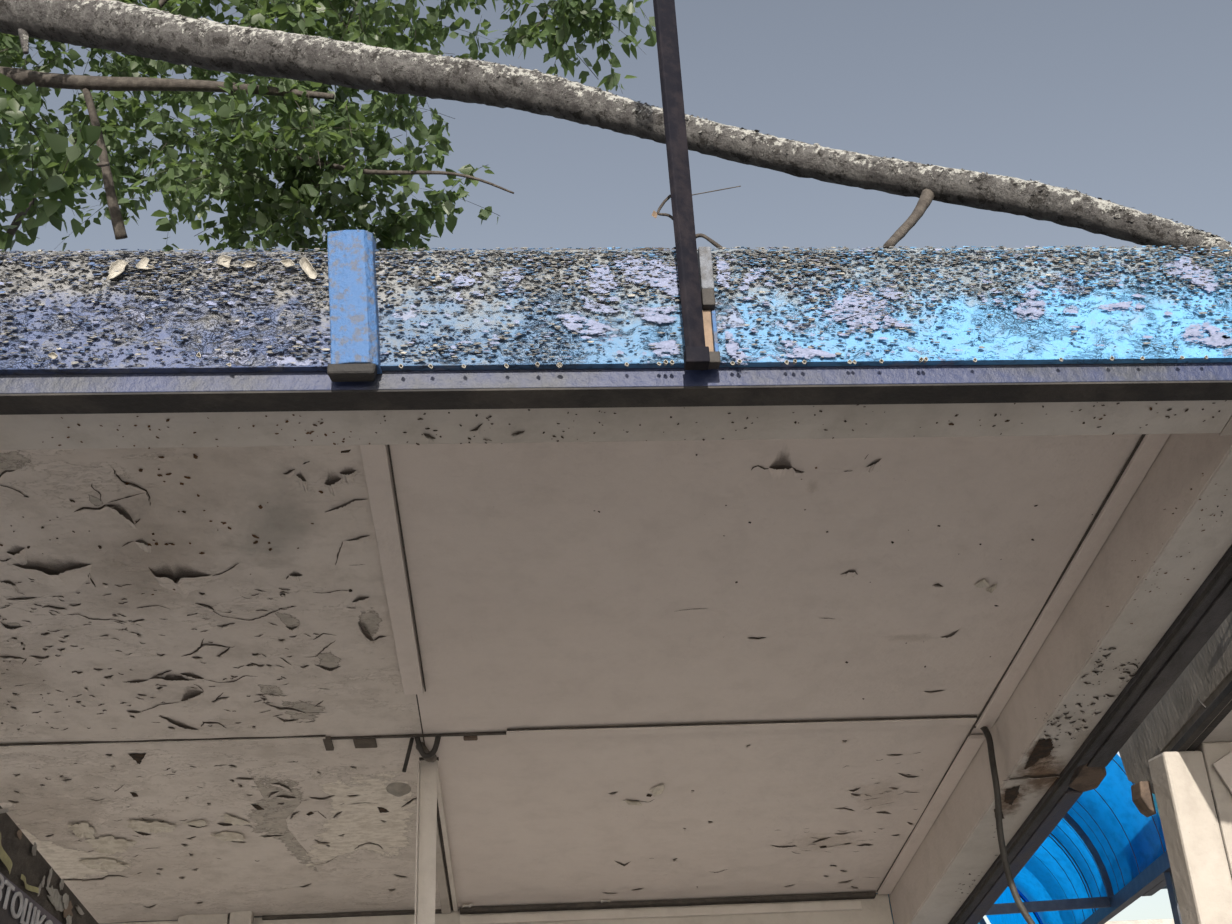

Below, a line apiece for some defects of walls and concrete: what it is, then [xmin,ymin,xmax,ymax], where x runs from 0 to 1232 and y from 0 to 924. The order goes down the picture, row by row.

peeling [94,257,156,285]
peeling [216,255,257,268]
peeling [280,257,317,289]
peeling [436,272,484,304]
peeling [537,255,681,367]
peeling [722,324,753,365]
peeling [716,255,774,299]
peeling [777,284,917,365]
peeling [970,272,1070,322]
peeling [1154,256,1232,304]
peeling [127,670,325,724]
peeling [15,764,417,882]